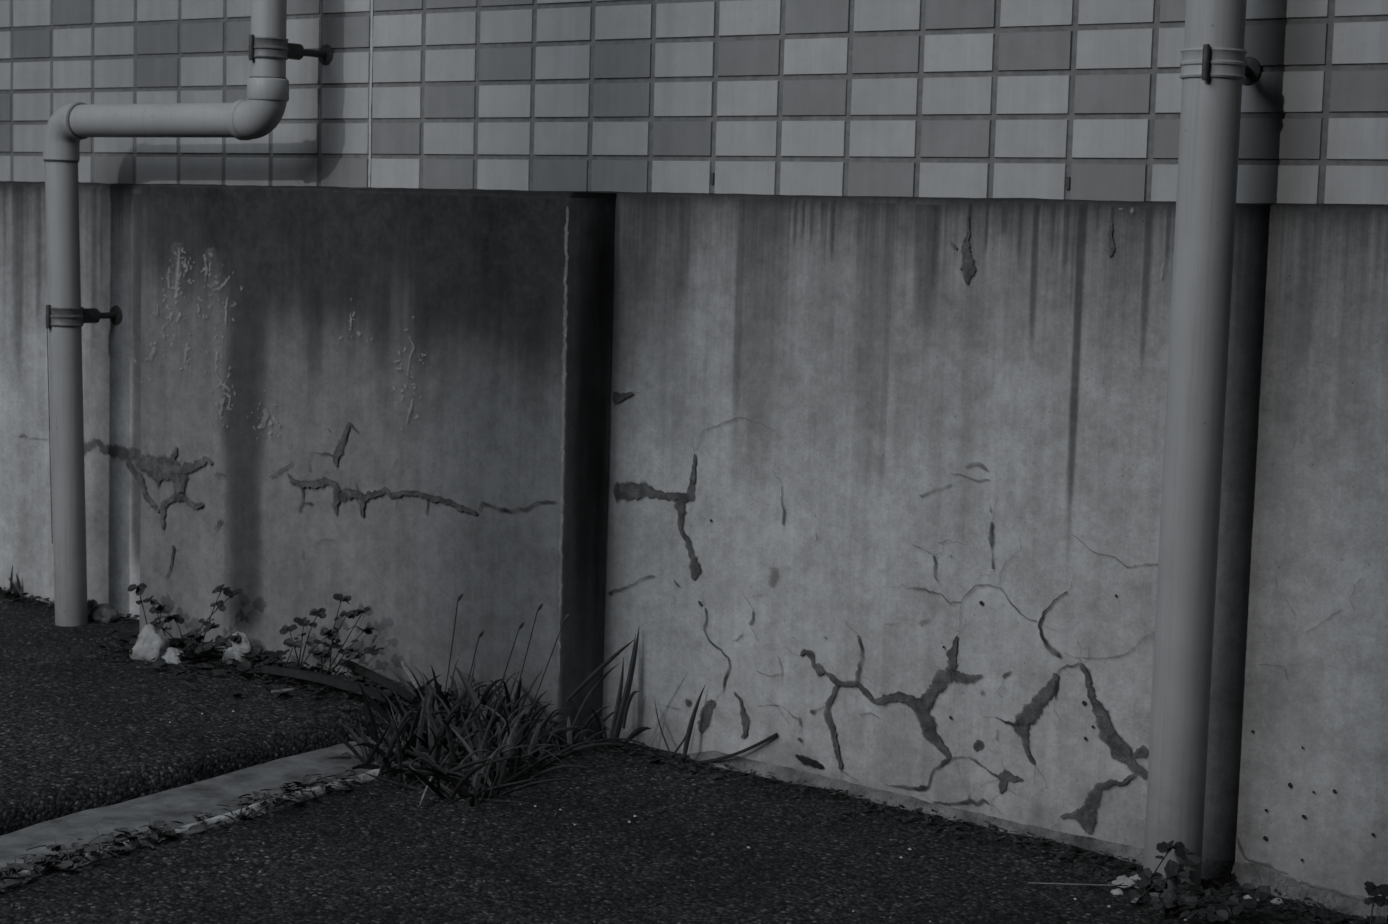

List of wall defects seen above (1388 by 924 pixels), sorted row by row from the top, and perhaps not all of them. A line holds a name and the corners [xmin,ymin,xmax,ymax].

leakage [158,185,610,623]
crack [270,422,556,517]
crack [608,454,730,691]
crack [779,486,787,525]
crack [772,507,1148,834]